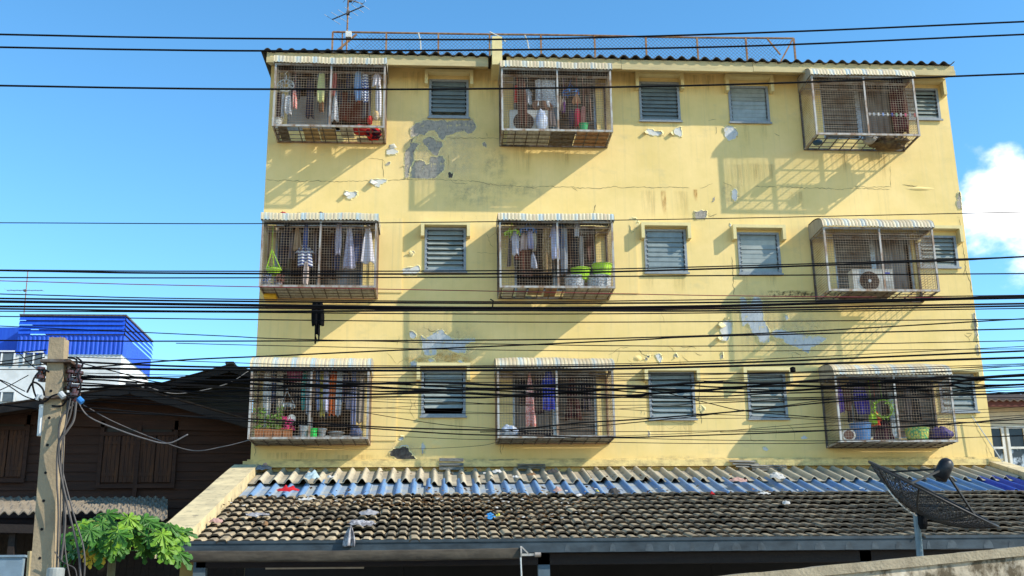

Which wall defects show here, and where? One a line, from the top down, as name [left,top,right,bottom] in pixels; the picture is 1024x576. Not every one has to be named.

peeling [644,126,683,138]
peeling [722,125,739,141]
flaking render [369,118,487,188]
peeling [344,190,359,200]
peeling [717,296,827,359]
peeling [408,329,477,367]
flaking render [388,435,427,459]